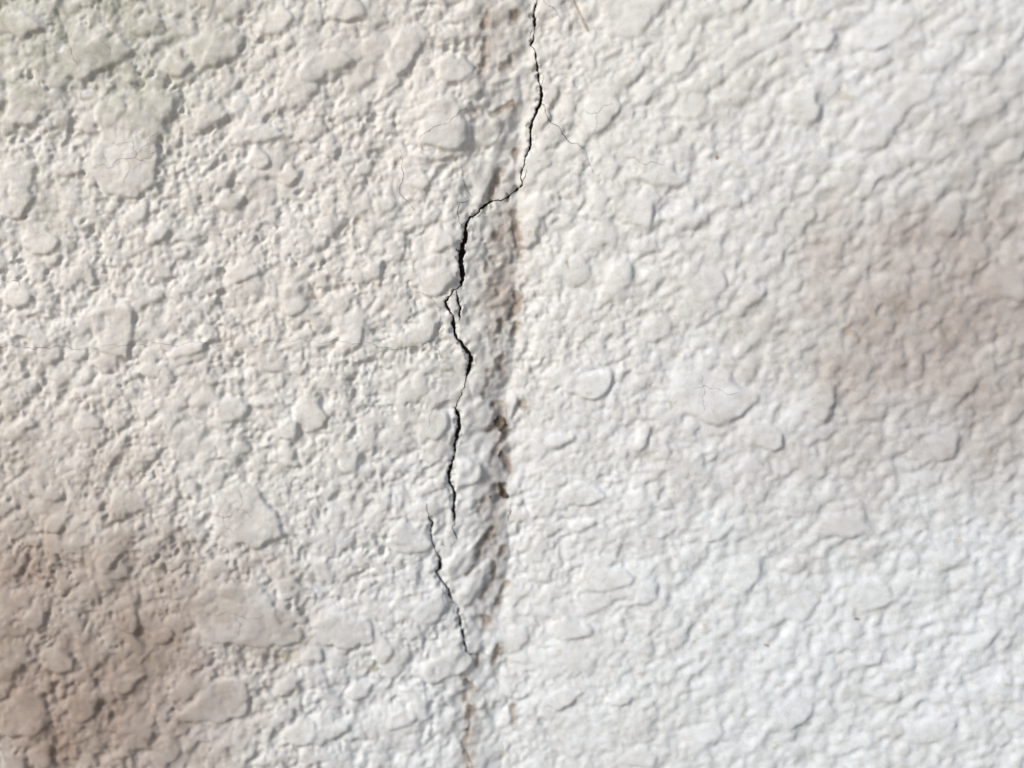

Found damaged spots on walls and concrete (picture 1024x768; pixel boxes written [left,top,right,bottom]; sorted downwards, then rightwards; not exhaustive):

crack [255,1,612,768]